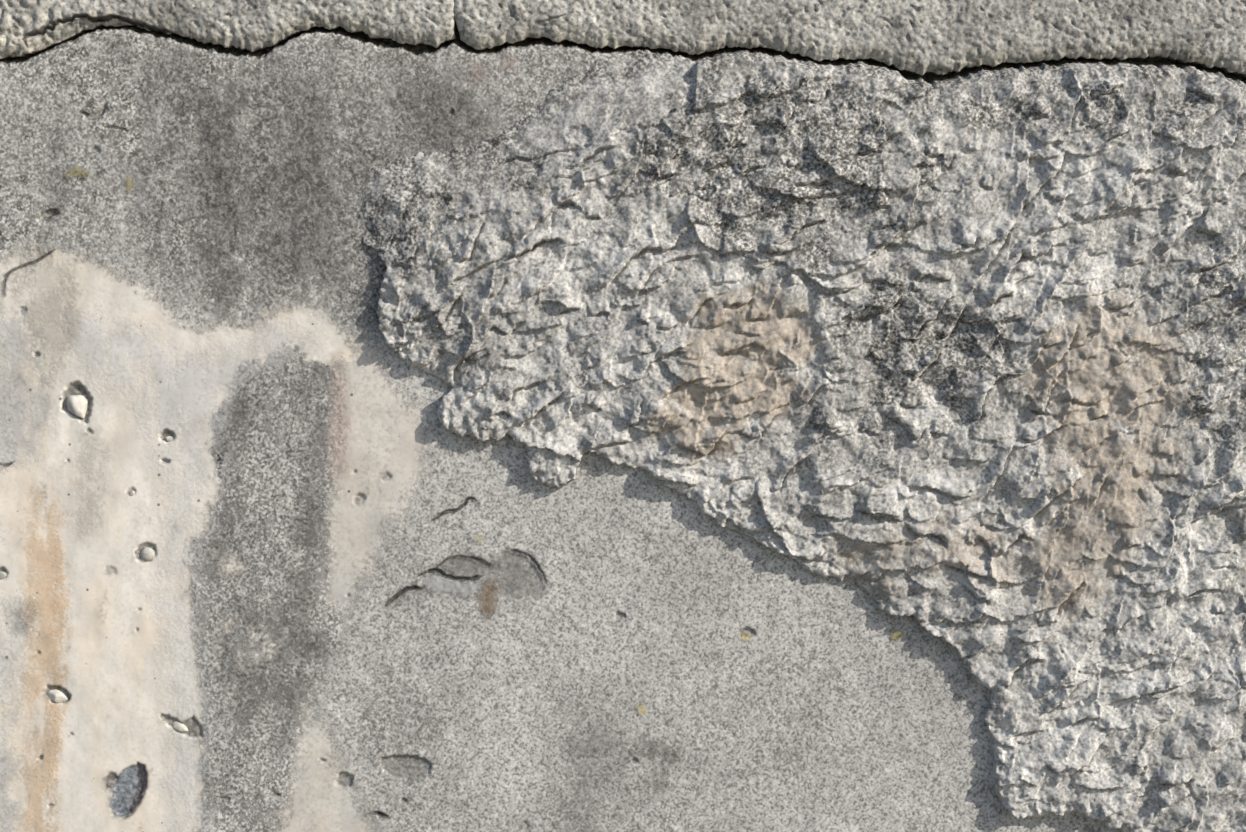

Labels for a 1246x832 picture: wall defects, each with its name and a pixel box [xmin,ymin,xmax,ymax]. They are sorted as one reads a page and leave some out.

crack [0,14,1246,84]
leakage [64,318,348,832]
peeling [0,241,433,832]
spalling [385,548,549,613]
spalling [647,282,815,458]
spalling [1028,295,1183,612]